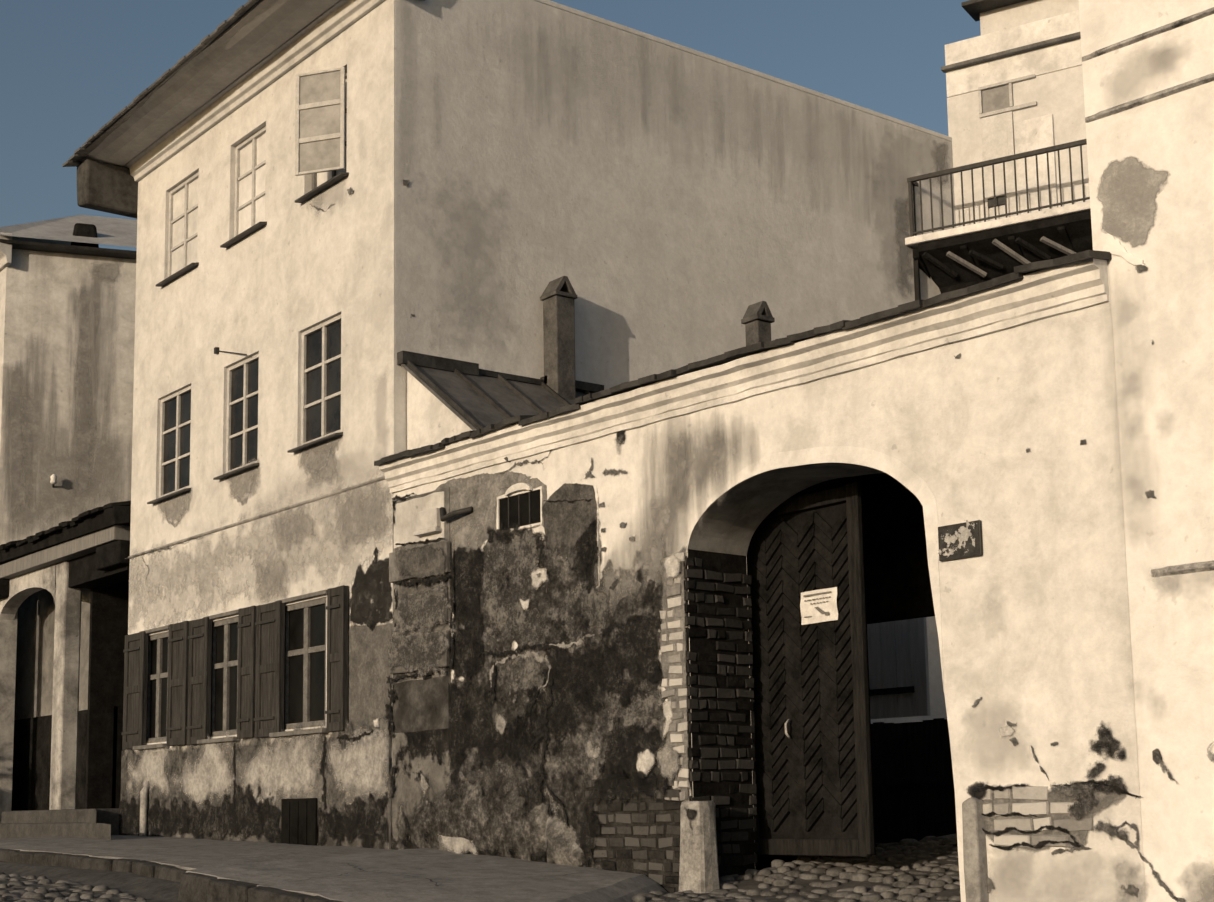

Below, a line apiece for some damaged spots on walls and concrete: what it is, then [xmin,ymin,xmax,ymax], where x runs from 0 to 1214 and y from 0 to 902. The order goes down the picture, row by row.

peeling [1098,156,1168,273]
leakage [7,263,123,534]
leakage [571,431,738,605]
peeling [339,522,759,893]
leakage [119,716,389,849]
spalling [967,723,1141,851]
crack [1051,821,1185,902]